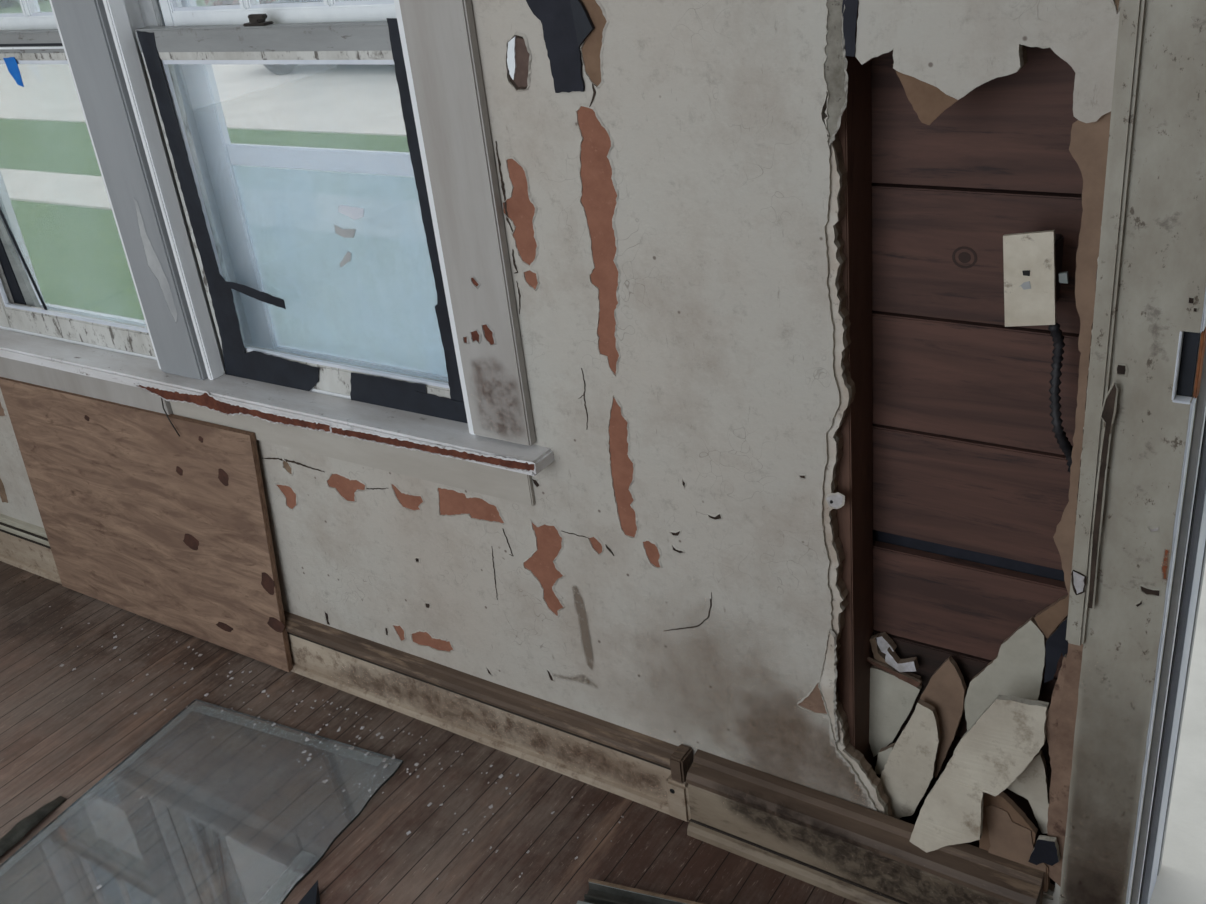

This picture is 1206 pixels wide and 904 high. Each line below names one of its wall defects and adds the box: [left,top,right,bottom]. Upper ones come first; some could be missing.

peeling [580,0,609,89]
spalling [822,0,848,148]
peeling [502,156,540,291]
peeling [575,103,621,376]
peeling [134,383,541,488]
peeling [326,472,367,503]
peeling [390,482,506,525]
peeling [607,395,685,569]
peeling [523,519,566,618]
peeling [384,624,455,653]
spalling [818,628,839,745]
leakage [725,790,999,904]